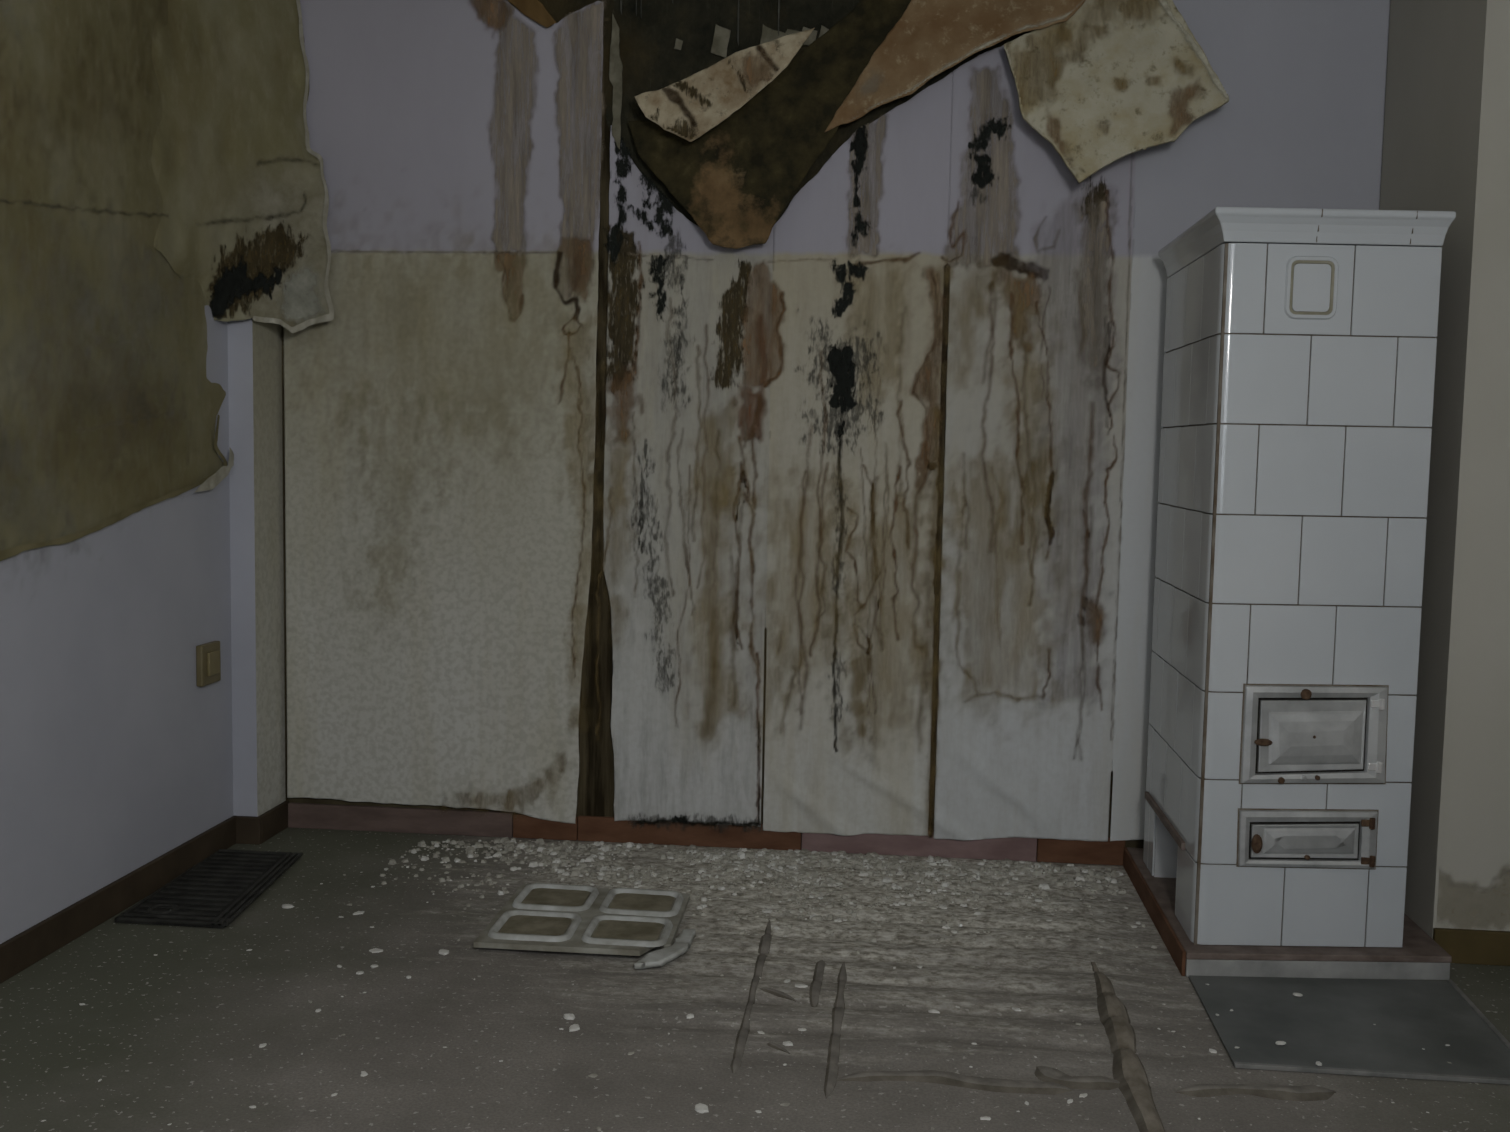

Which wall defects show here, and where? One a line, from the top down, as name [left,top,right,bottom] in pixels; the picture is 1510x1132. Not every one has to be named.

spalling [539,0,860,226]
spalling [776,30,1034,222]
peeling [0,0,234,561]
water stain [942,68,1050,545]
water stain [1081,177,1119,427]
water stain [798,115,918,752]
water stain [1085,454,1117,690]